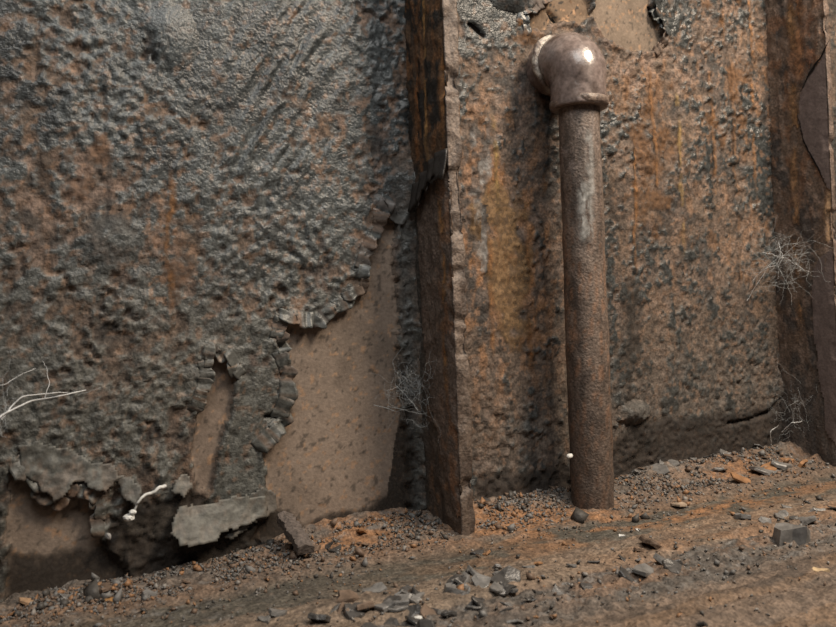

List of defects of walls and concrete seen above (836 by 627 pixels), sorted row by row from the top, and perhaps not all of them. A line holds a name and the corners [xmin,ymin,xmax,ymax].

peeling [516,0,672,58]
corrosion [631,87,681,238]
crack [797,117,827,188]
peeling [798,52,830,189]
crack [801,41,829,90]
corrosion [469,179,534,359]
peeling [170,148,462,548]
peeling [812,251,836,445]